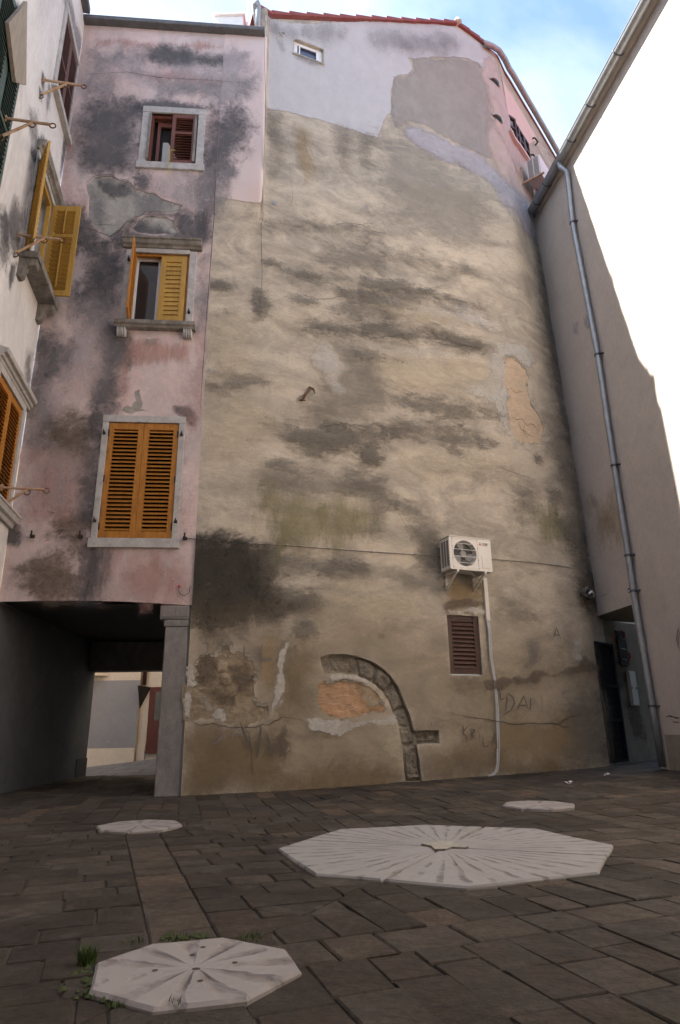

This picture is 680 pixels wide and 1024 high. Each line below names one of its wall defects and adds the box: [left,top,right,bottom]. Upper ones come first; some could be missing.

water stain [97,45,245,67]
peeling [264,15,535,195]
water stain [0,201,25,287]
flaking render [86,176,182,237]
water stain [16,78,253,603]
flaking render [462,341,544,445]
water stain [7,525,21,545]
water stain [191,529,368,709]
flaking render [181,645,269,727]
flaking render [314,678,388,721]
crack [448,712,579,728]